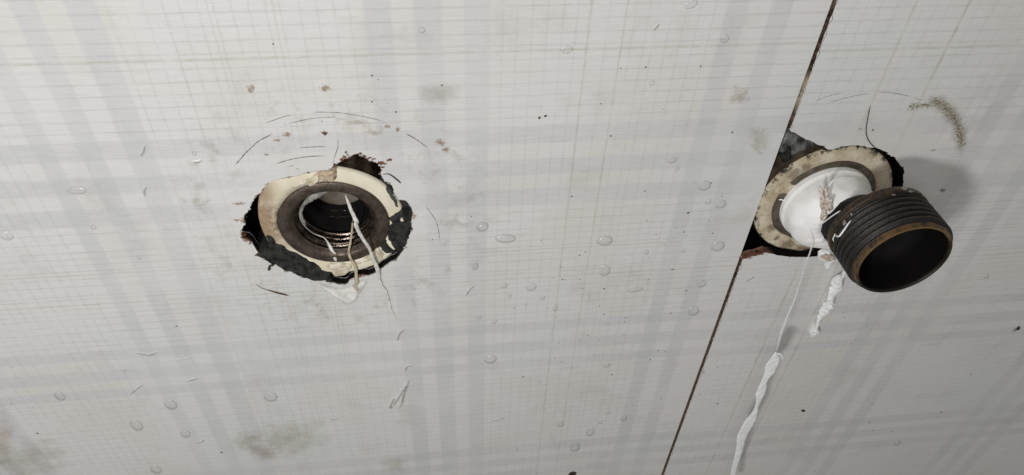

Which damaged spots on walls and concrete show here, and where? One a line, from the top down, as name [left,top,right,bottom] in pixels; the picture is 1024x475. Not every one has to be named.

spalling [240,154,414,286]